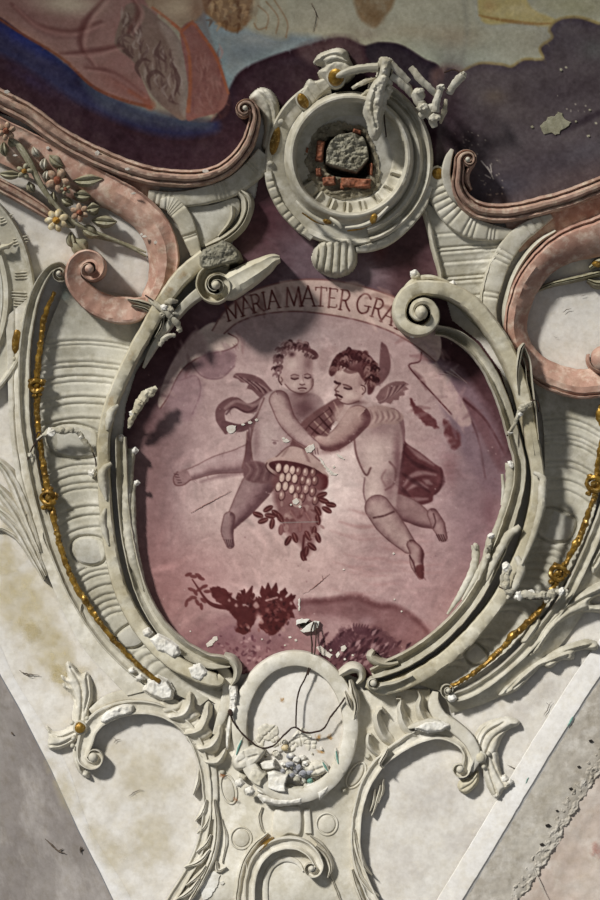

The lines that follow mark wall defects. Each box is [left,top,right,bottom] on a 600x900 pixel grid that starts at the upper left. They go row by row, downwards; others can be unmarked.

peeling [531,112,577,135]
flaking render [304,121,381,200]
flaking render [284,598,320,646]
flaking render [143,627,181,658]
peeling [316,645,354,660]
flaking render [127,667,175,701]
flaking render [188,663,209,681]
flaking render [235,739,328,807]
flaking render [511,739,600,900]